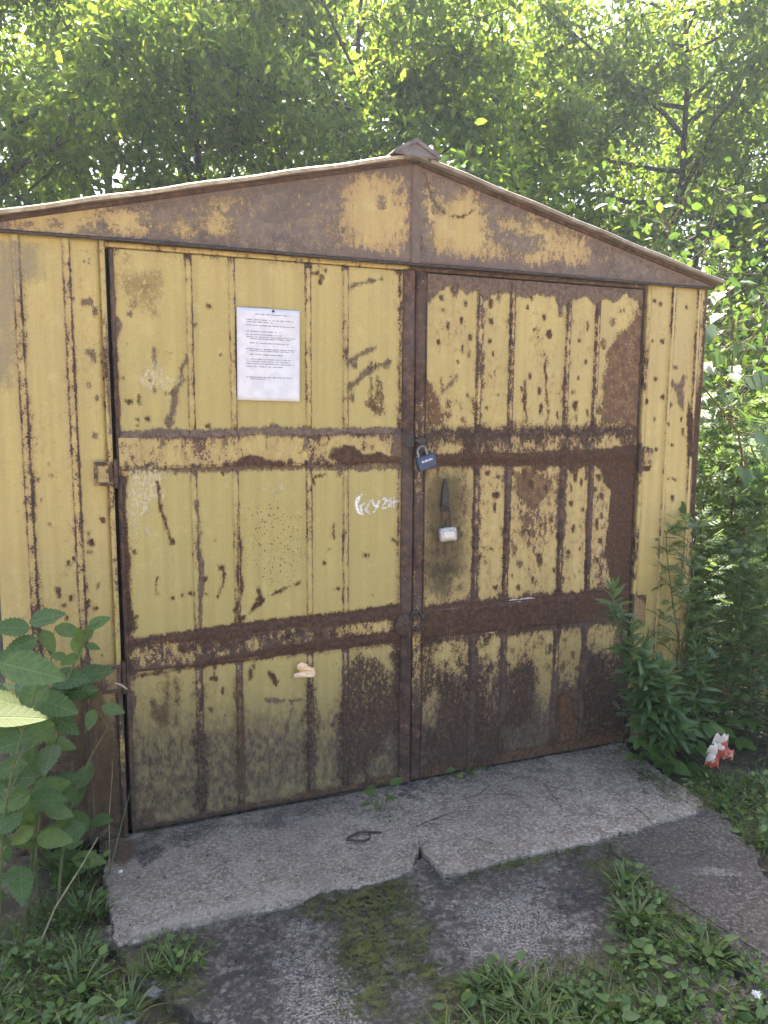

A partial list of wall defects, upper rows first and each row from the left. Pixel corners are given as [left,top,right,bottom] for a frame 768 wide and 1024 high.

rust [85,310,405,792]
rust [421,247,694,777]
rust [667,325,705,527]
rust [71,682,139,863]
rust [190,682,213,811]